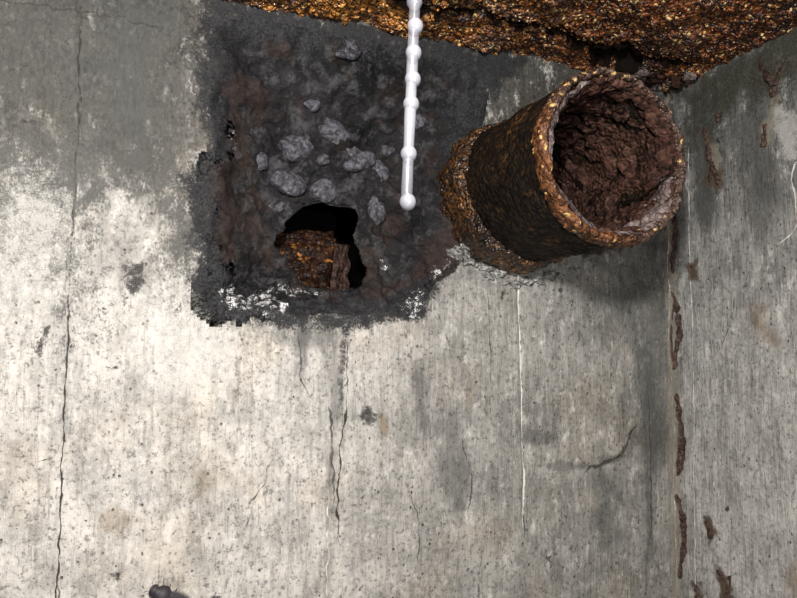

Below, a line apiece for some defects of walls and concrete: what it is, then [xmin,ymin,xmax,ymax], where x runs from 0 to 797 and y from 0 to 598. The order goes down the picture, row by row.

spalling [207,17,580,318]
rust [547,66,698,274]
crack [4,0,164,598]
rust [669,291,683,370]
rust [674,393,686,476]
rust [674,494,703,598]
rust [704,516,718,543]
rust [716,568,734,598]